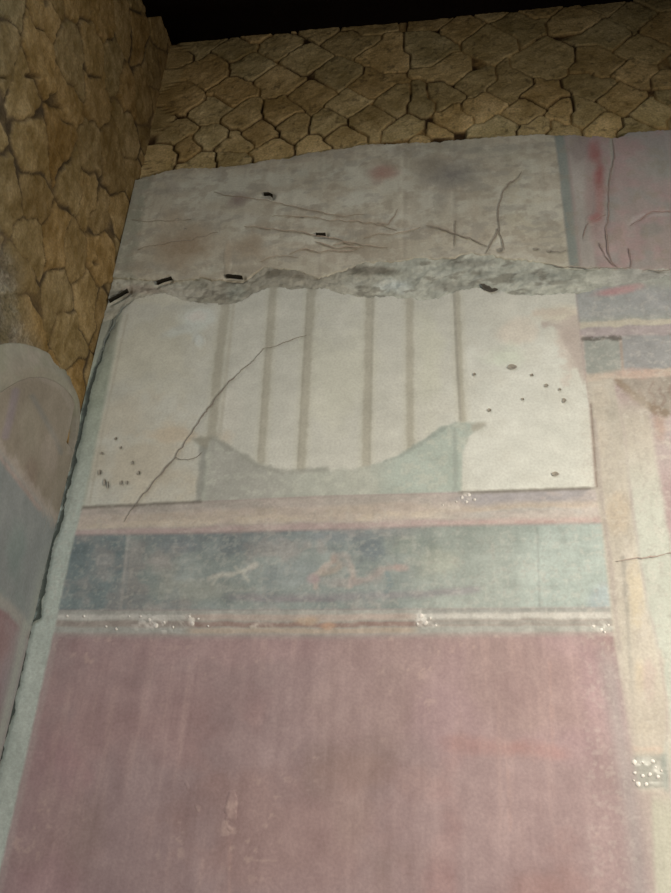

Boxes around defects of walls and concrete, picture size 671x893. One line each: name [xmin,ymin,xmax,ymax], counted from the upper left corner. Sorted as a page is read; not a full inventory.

crack [216,173,521,262]
crack [550,139,671,272]
spalling [102,247,671,323]
crack [480,284,498,292]
crack [124,335,306,522]
crack [620,552,671,561]
leakage [631,754,667,788]